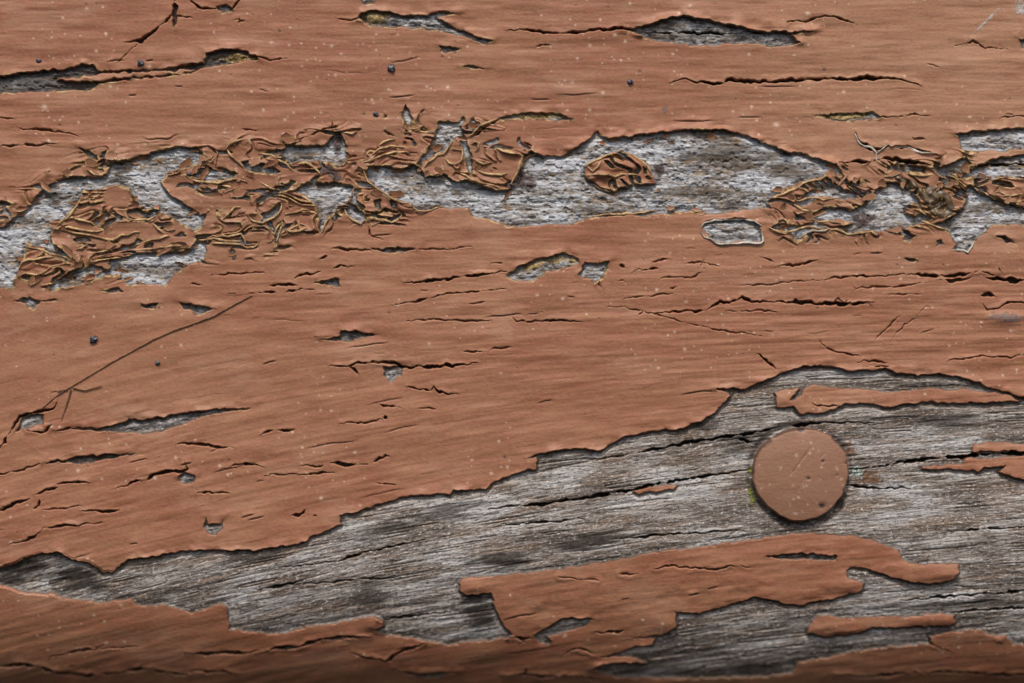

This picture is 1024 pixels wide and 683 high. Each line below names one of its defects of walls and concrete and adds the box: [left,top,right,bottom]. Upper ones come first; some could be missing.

peeling [0,47,261,97]
peeling [355,0,497,72]
peeling [625,12,818,50]
crack [672,39,1009,87]
peeling [0,102,1024,314]
crack [330,262,581,426]
crack [597,256,1024,370]
crack [0,402,397,546]
peeling [0,363,1024,683]
crack [614,529,745,541]
crack [487,403,875,527]
crack [846,451,1024,491]